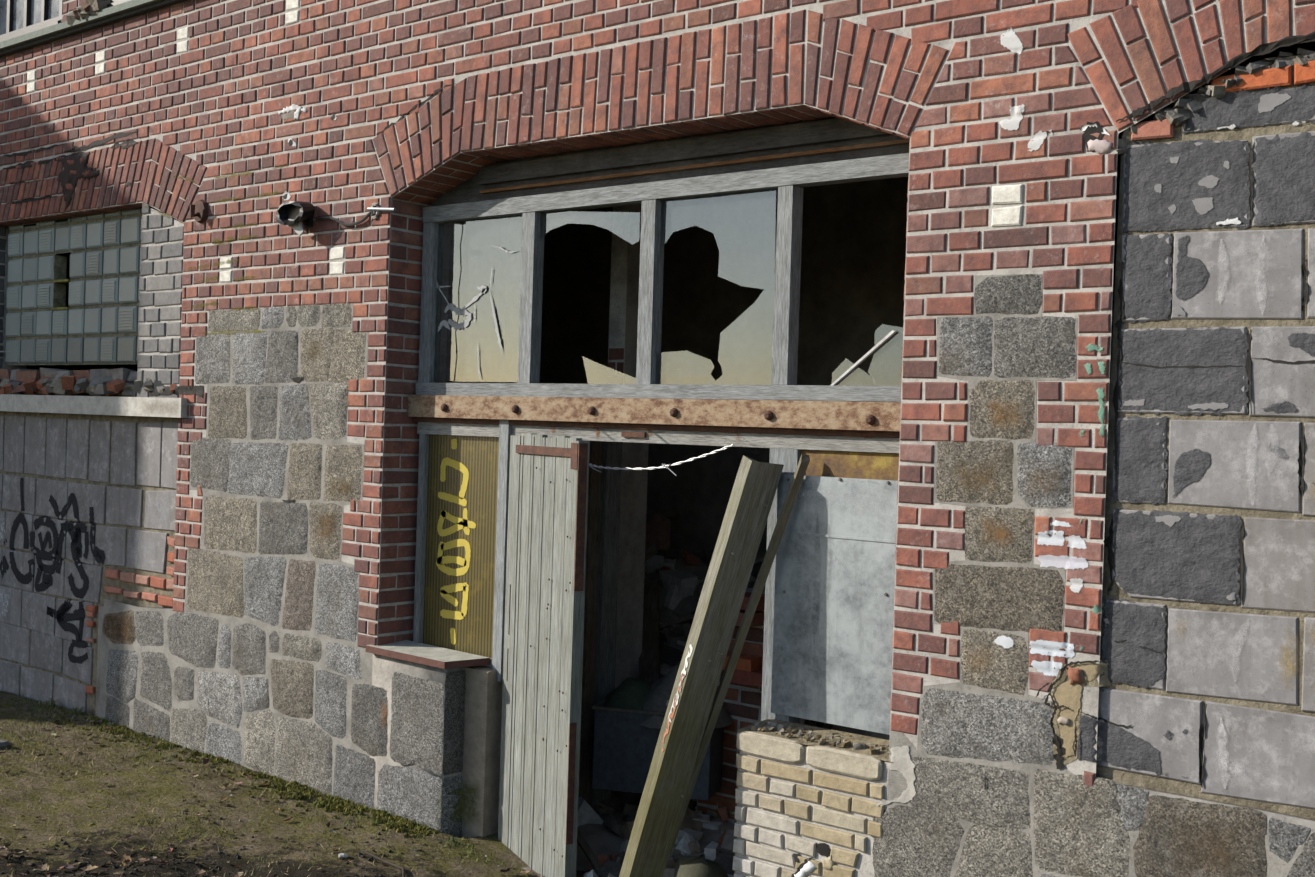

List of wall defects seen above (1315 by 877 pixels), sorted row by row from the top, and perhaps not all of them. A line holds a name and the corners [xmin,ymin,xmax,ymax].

spalling [57,152,99,209]
spalling [0,368,203,398]
spalling [1051,84,1315,776]